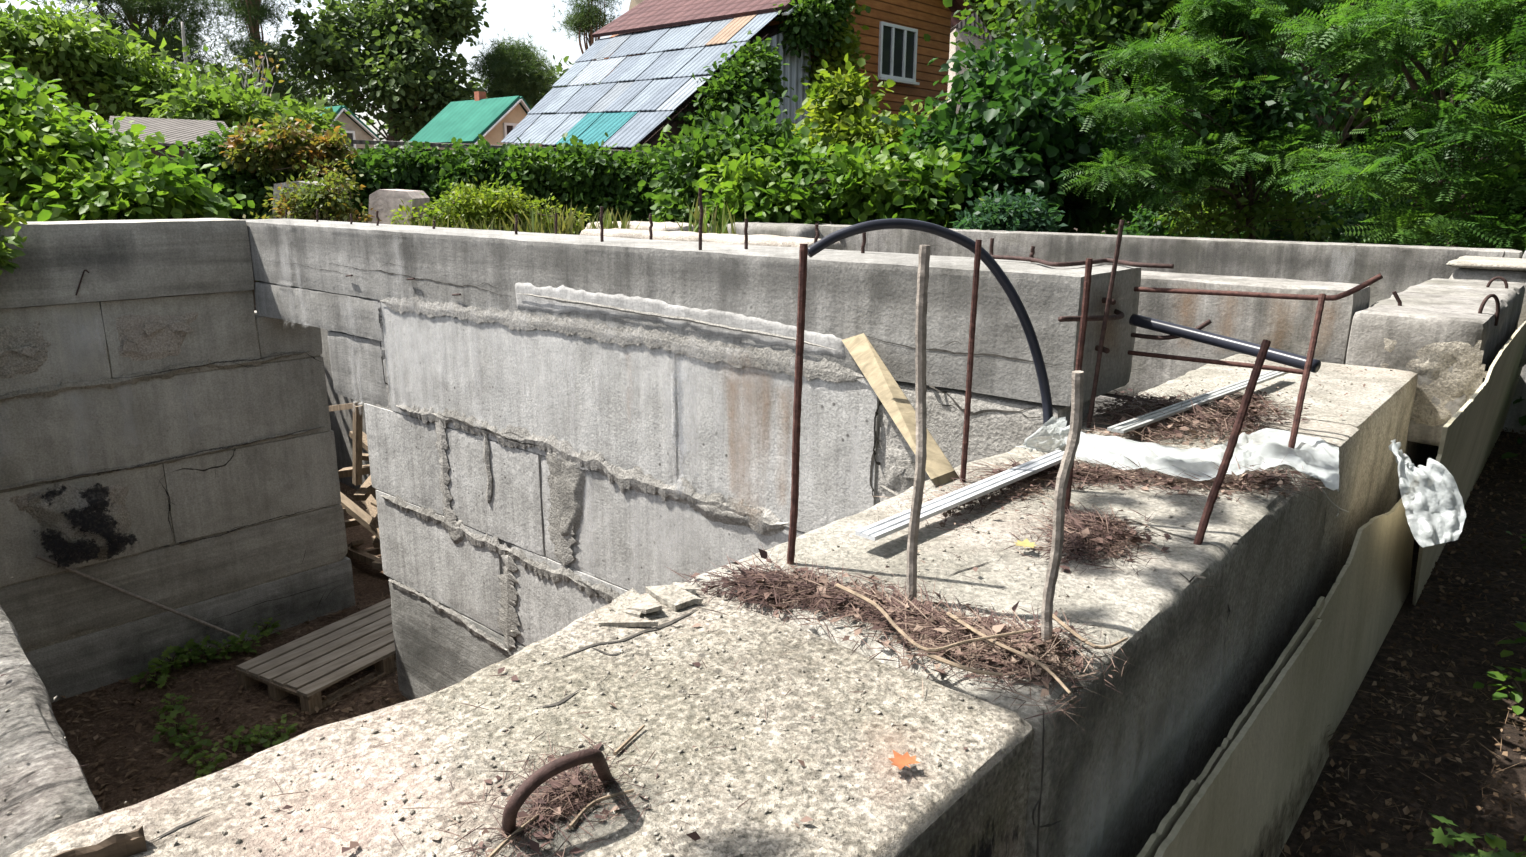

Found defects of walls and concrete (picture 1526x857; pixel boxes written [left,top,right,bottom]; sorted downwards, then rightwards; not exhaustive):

spalling [0,320,51,379]